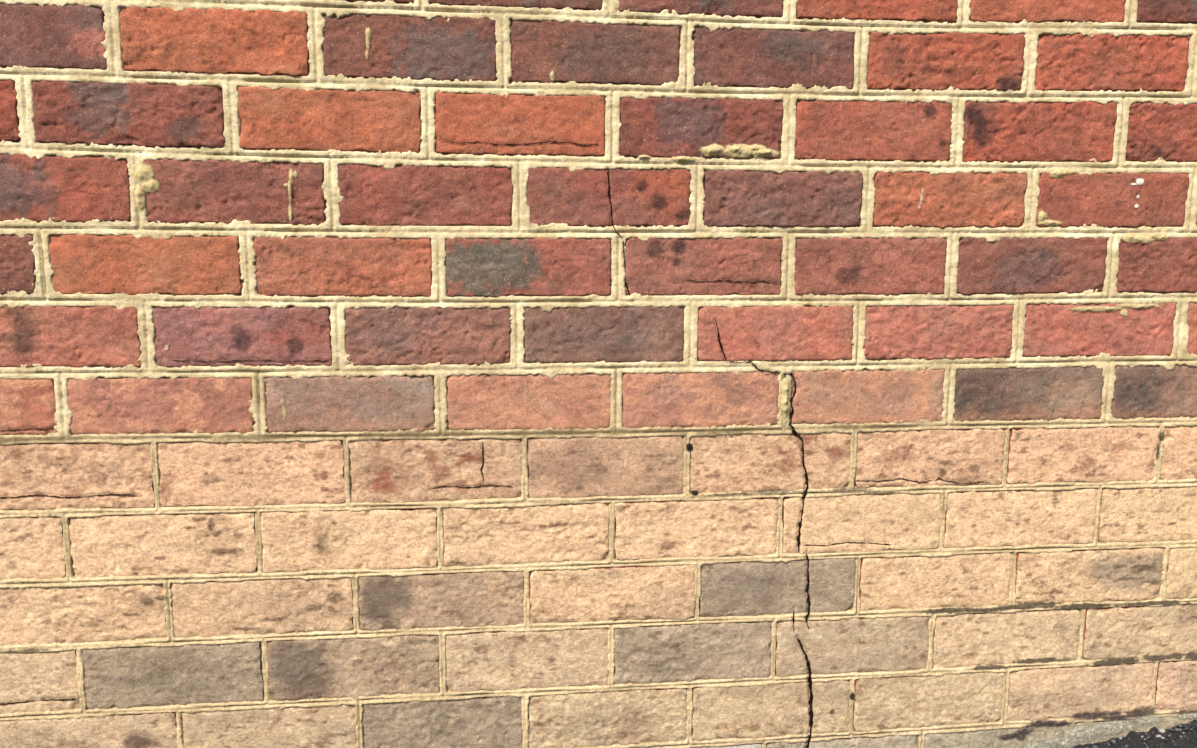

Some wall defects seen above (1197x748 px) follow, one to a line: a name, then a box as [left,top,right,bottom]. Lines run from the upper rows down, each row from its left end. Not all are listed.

crack [672,278,777,286]
crack [715,320,892,748]